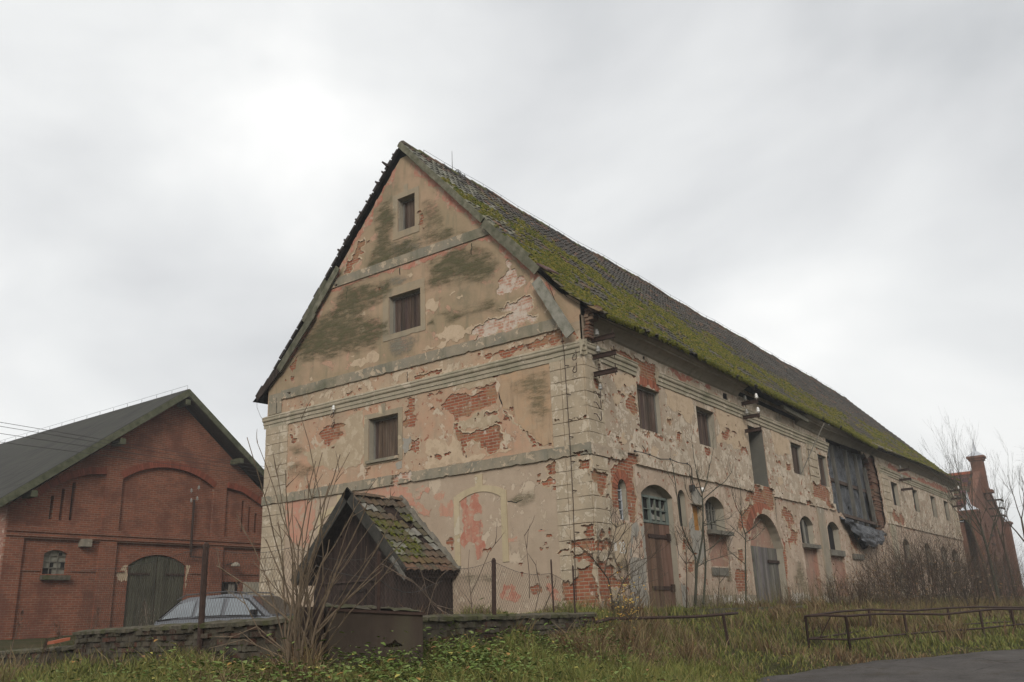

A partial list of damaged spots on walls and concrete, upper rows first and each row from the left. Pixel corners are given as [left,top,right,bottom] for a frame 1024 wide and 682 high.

spalling [285,165,565,394]
flaking render [288,409,371,476]
peeling [357,364,557,560]
spalling [500,436,639,608]
flaking render [594,342,748,462]
spalling [728,430,798,593]